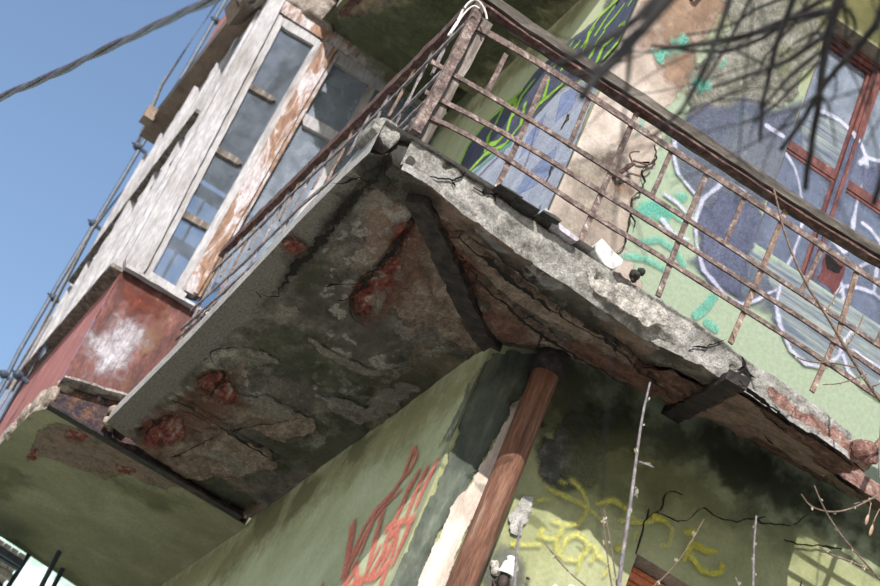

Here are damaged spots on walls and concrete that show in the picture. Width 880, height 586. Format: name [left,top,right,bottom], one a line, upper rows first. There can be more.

peeling [338,0,389,20]
peeling [611,0,825,114]
peeling [549,92,671,327]
peeling [353,219,481,354]
crack [444,233,673,401]
peeling [27,371,316,489]
crack [138,347,298,466]
peeling [390,223,699,586]
leakage [541,361,863,533]
crack [635,491,842,554]